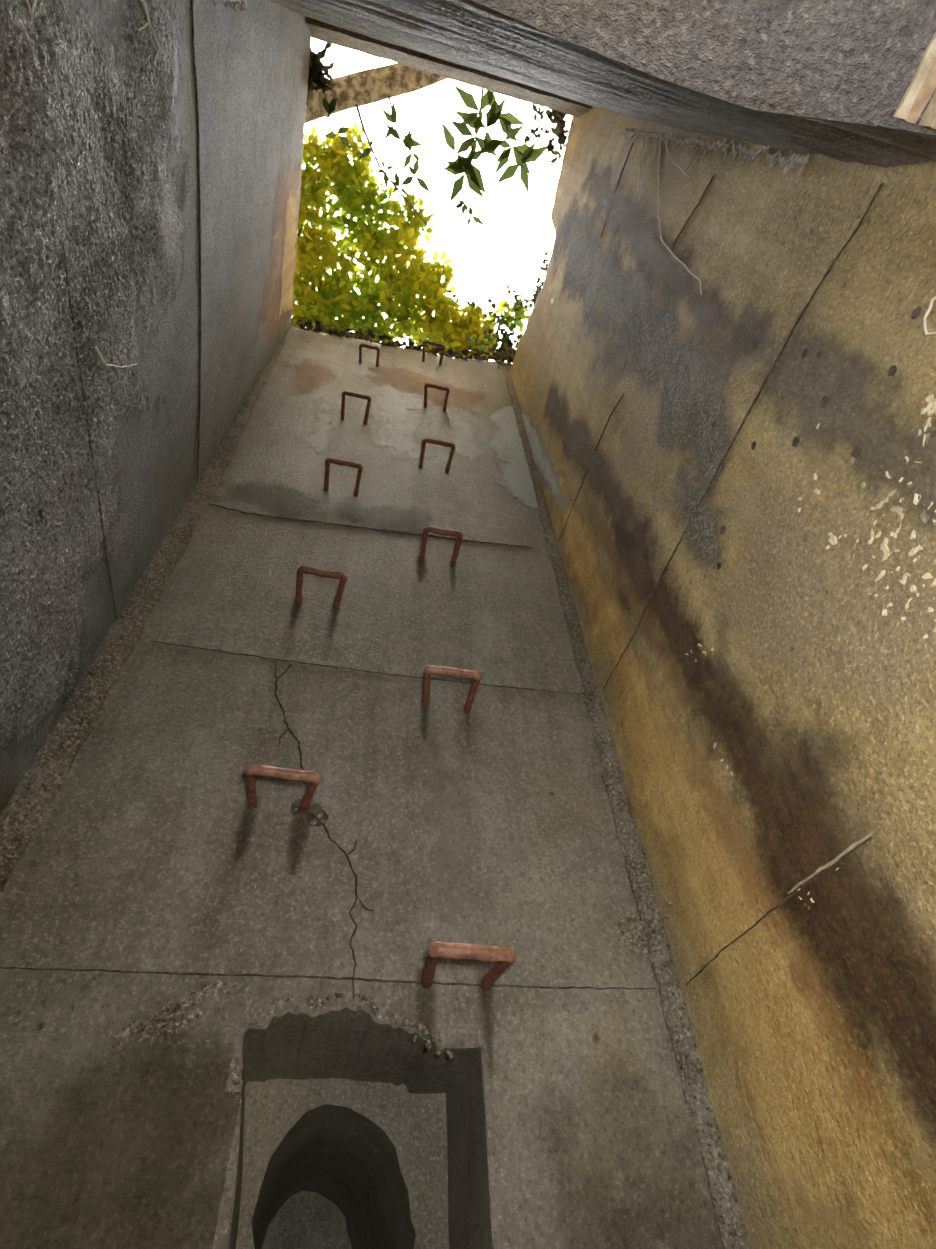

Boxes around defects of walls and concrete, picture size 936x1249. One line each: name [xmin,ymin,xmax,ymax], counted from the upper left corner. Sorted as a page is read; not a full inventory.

spalling [0,0,189,749]
peeling [918,394,936,446]
peeling [825,471,936,620]
damp [487,387,936,1135]
crack [0,814,877,999]
spalling [246,992,453,1059]